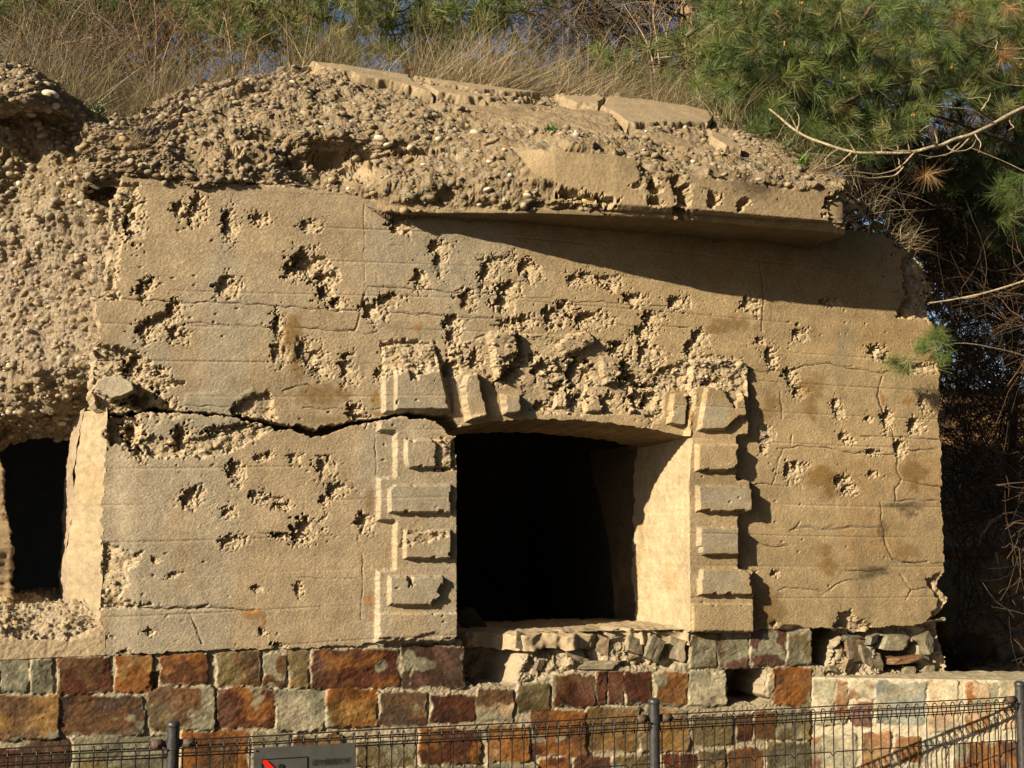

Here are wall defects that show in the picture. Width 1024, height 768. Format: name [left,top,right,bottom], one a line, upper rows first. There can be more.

peeling [423,83,533,107]
spalling [553,175,753,225]
spalling [817,187,846,236]
spalling [267,217,749,430]
spalling [738,293,763,320]
spalling [894,255,932,325]
spalling [91,181,356,553]
crack [107,384,461,470]
crack [748,362,939,593]
spalling [352,509,382,537]
spalling [832,608,872,633]